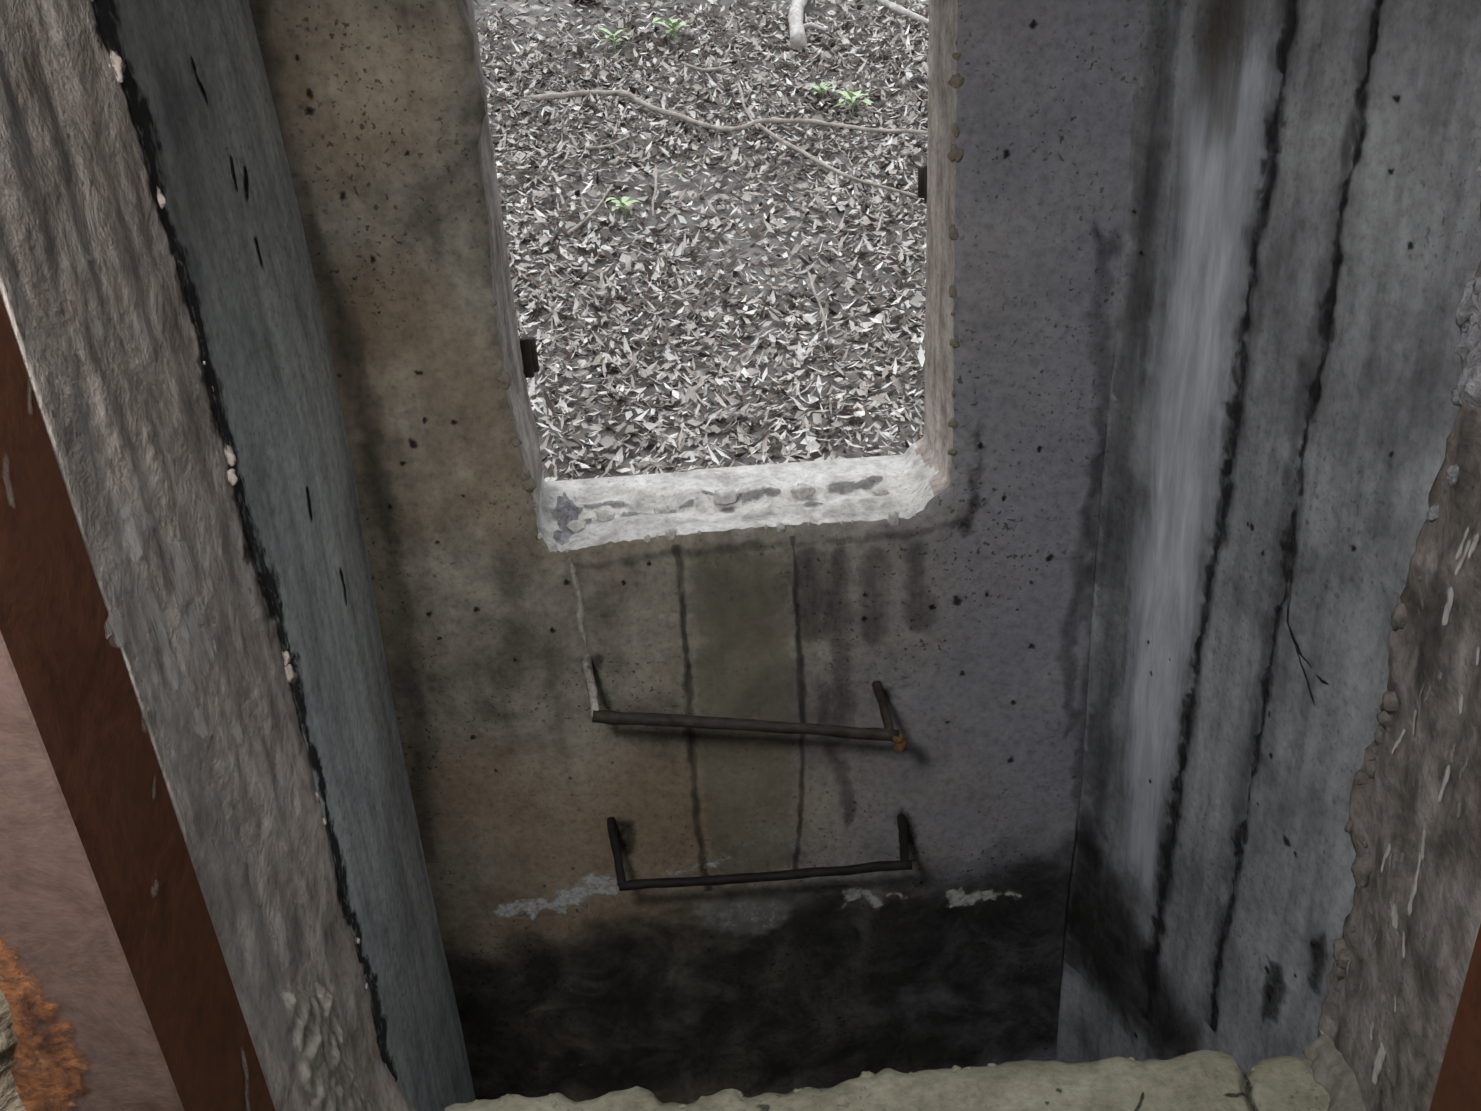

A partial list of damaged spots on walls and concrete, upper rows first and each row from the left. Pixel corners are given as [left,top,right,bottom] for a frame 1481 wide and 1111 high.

spalling [1451,275,1481,408]
crack [1144,0,1296,1021]
crack [1210,0,1382,1032]
spalling [1446,464,1459,487]
spalling [1354,691,1399,785]
spalling [1344,820,1373,886]
rust [0,939,87,1111]
leakage [446,829,1186,1100]